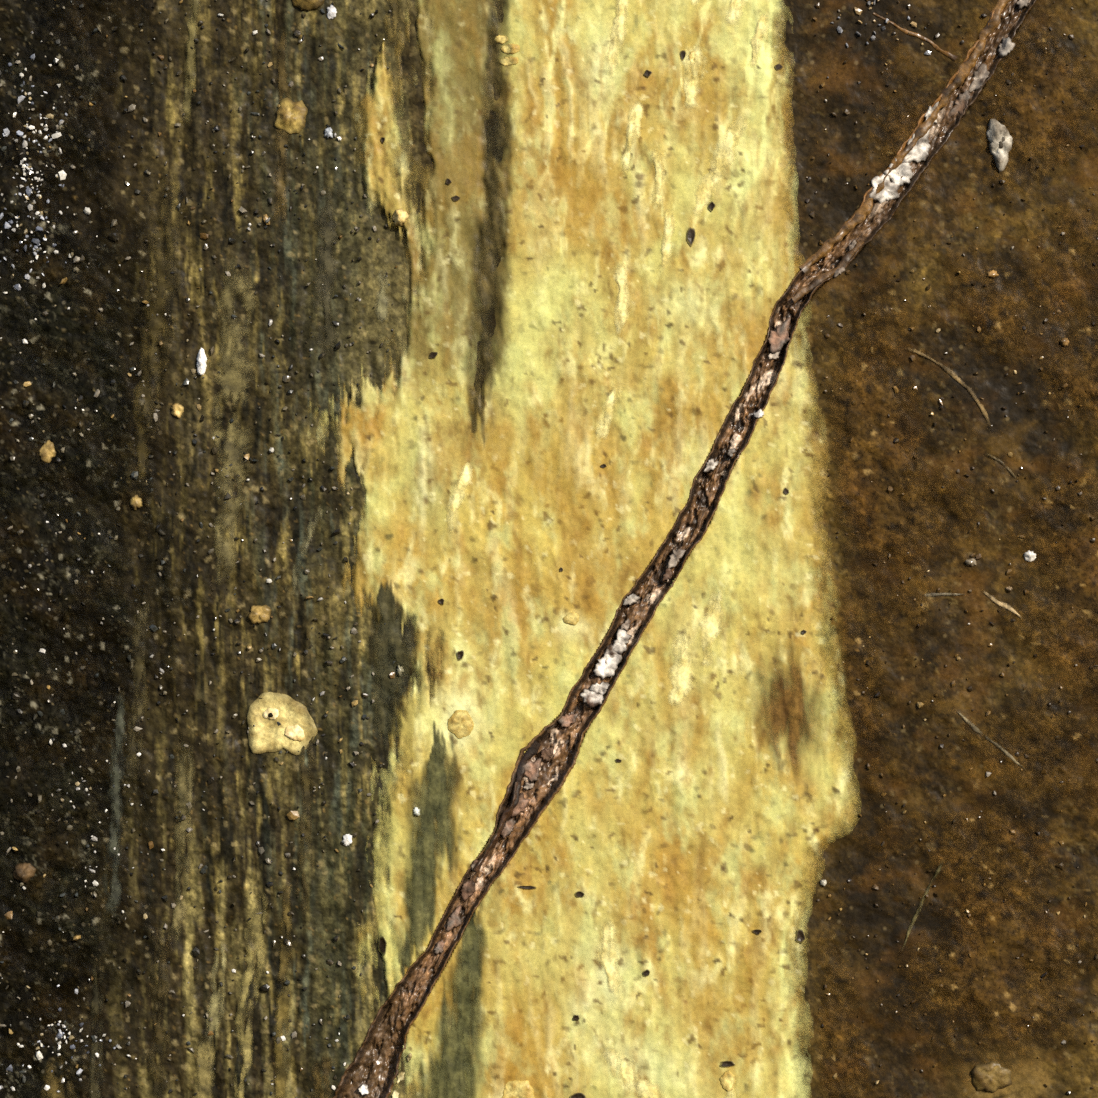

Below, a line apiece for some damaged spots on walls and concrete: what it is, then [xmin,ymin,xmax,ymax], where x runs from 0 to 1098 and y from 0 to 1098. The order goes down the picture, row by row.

leakage [183,0,199,118]
leakage [313,192,339,346]
leakage [213,275,256,572]
leakage [301,511,322,554]
leakage [321,0,800,996]
crack [332,0,1037,1098]
leakage [473,320,855,1098]
leakage [173,755,193,937]
leakage [194,948,226,1098]
leakage [234,905,266,1098]
leakage [274,737,314,1098]
leakage [395,935,463,1098]